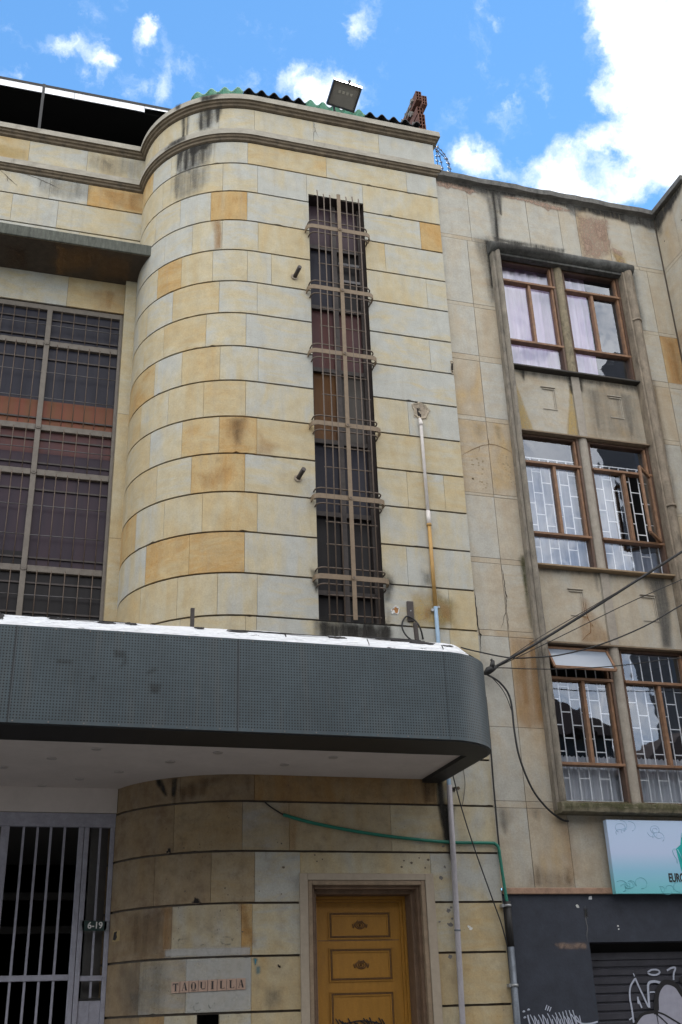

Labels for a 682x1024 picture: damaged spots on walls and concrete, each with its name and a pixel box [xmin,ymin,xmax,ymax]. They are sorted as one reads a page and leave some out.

leakage [167,104,211,172]
leakage [199,94,220,129]
crack [474,567,509,650]